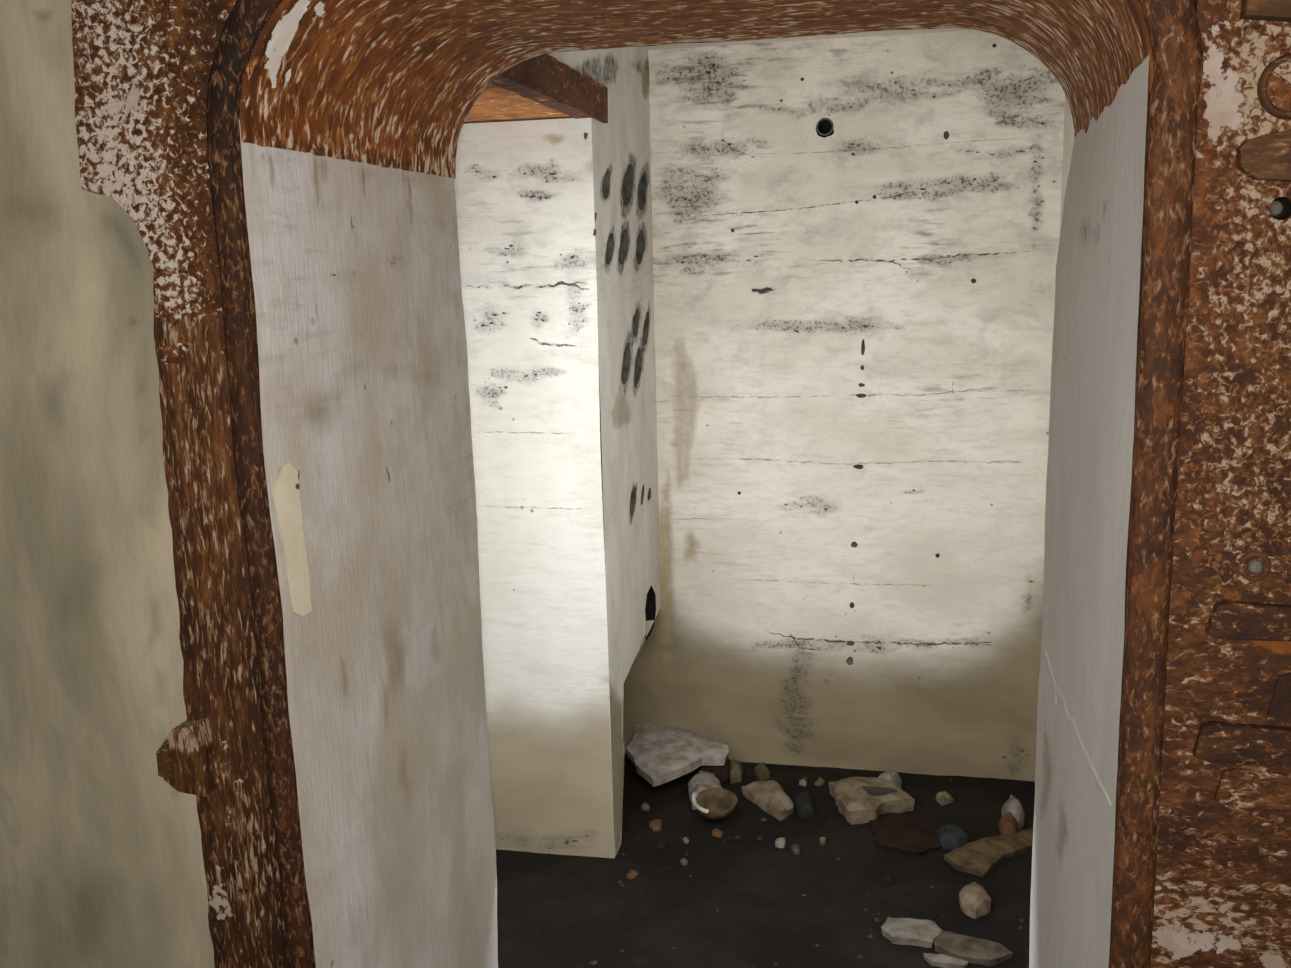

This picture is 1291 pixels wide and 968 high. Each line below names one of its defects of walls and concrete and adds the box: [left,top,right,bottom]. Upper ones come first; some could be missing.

peeling [264,0,325,88]
leakage [637,62,650,96]
leakage [667,54,746,101]
mould [809,70,1057,127]
leakage [520,165,557,200]
leakage [662,168,718,222]
leakage [884,174,1003,200]
peeling [273,462,312,616]
rust [1252,640,1291,654]
leakage [487,523,1048,858]